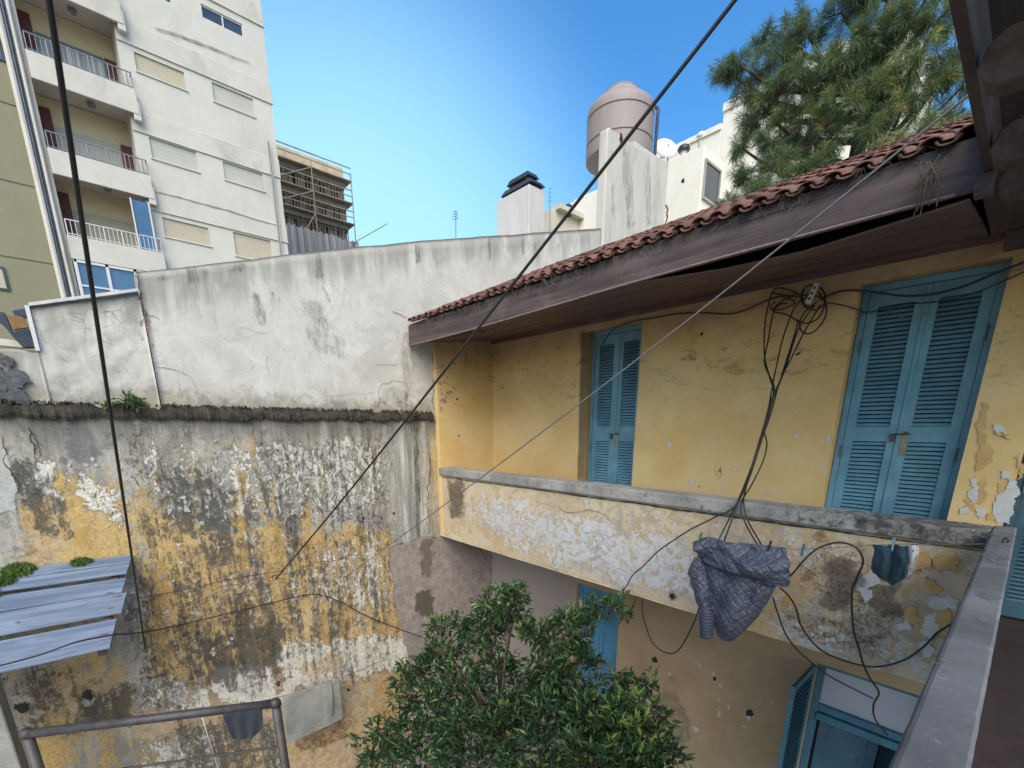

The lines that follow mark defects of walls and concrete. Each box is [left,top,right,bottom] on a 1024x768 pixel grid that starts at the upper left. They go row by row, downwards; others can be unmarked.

peeling [273,446,324,475]
peeling [960,402,1024,524]
peeling [144,478,190,515]
peeling [831,544,881,602]
leakage [415,590,434,616]
peeling [896,551,960,659]
peeling [785,617,856,660]